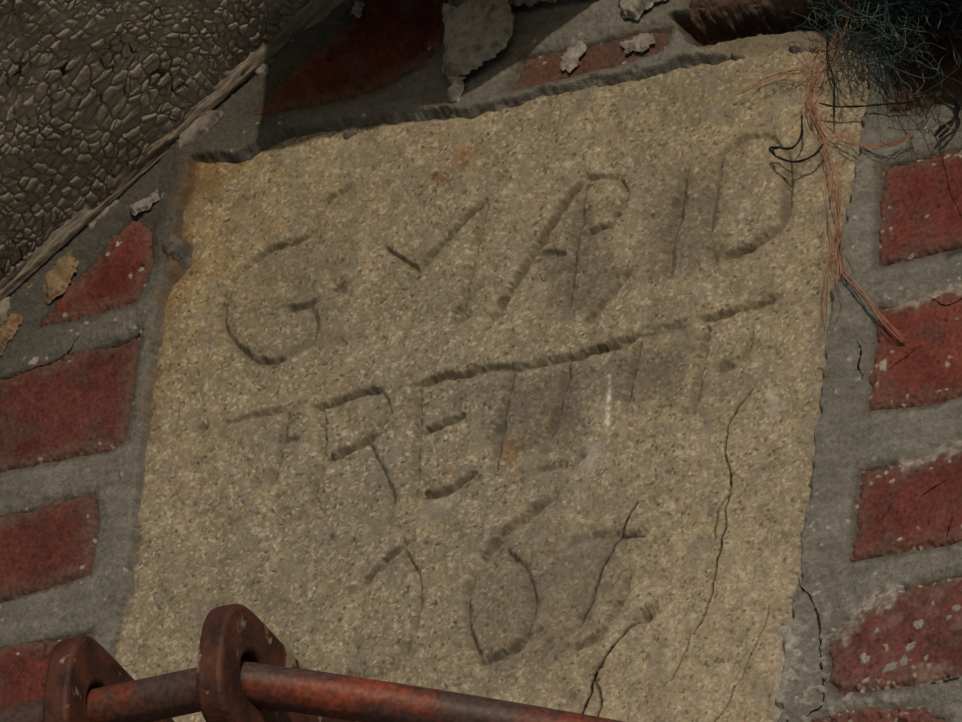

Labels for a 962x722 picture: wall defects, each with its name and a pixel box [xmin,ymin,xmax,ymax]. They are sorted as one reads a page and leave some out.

peeling [441,0,557,102]
crack [3,336,79,379]
crack [584,504,644,623]
crack [697,393,751,629]
crack [582,623,640,716]
crack [786,578,825,722]